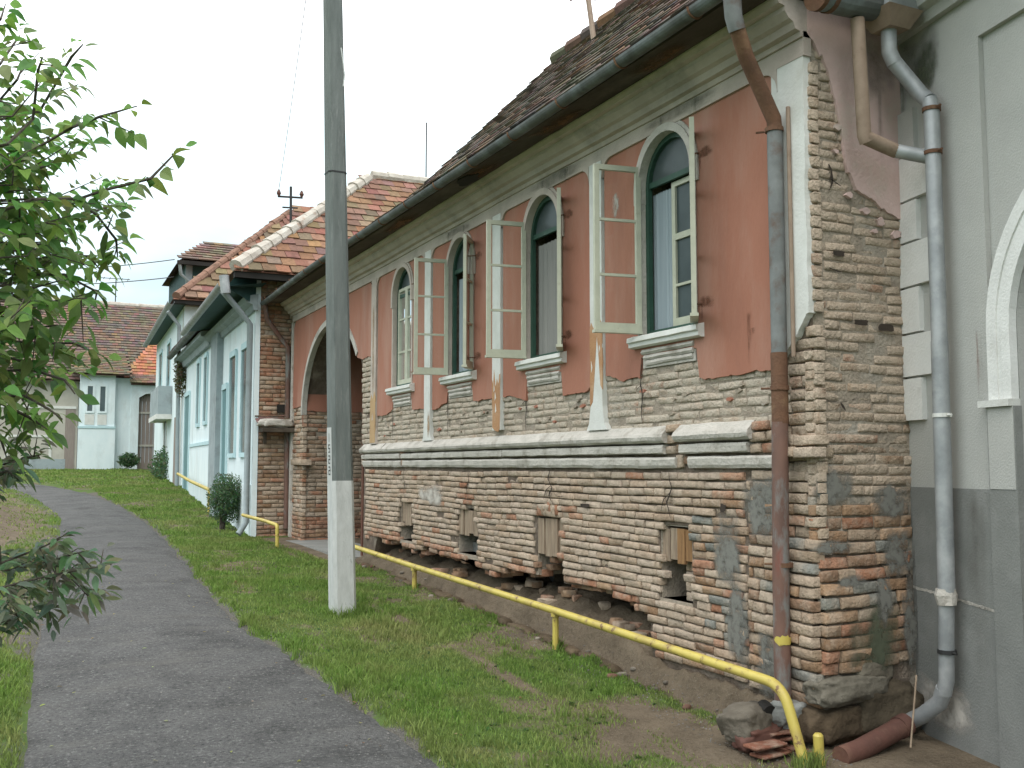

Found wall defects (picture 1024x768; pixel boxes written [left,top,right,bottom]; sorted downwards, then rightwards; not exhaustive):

spalling [788,51,912,506]
spalling [291,406,328,540]
spalling [352,320,772,538]
crack [661,473,672,518]